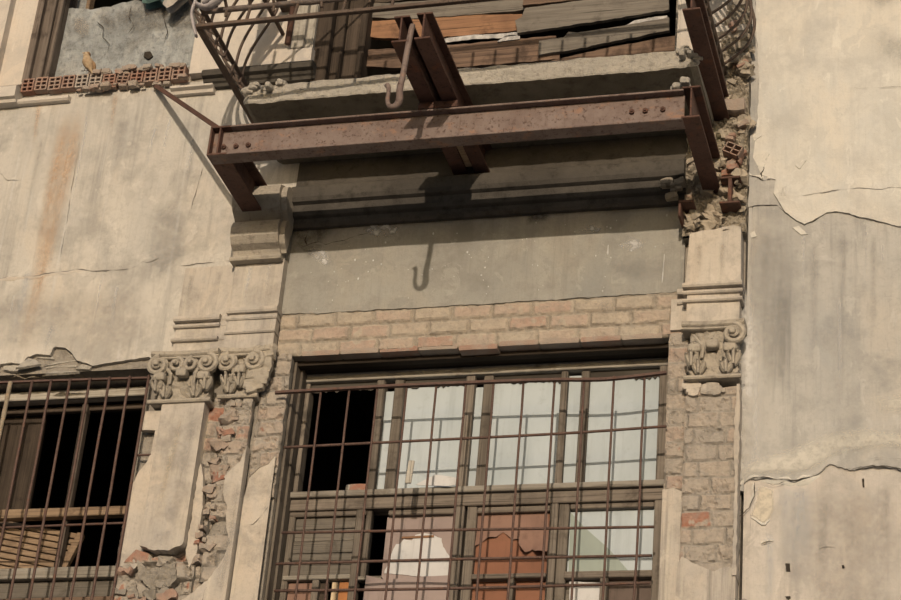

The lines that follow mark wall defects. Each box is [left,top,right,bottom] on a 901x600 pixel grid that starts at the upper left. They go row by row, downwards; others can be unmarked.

flaking render [77,51,189,93]
flaking render [660,4,769,245]
crack [749,169,774,181]
crack [0,141,158,281]
crack [750,187,900,227]
flaking render [112,343,294,600]
crack [740,464,901,516]